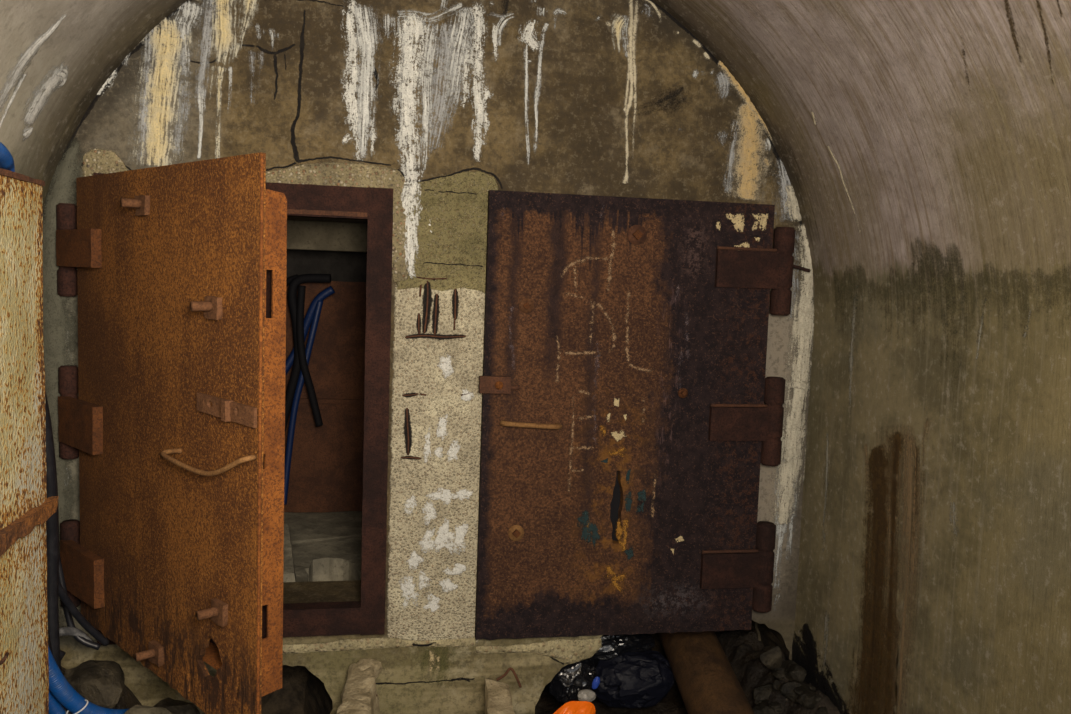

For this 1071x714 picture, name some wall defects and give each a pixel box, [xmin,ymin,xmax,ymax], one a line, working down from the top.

damp [0,15,66,127]
crack [43,0,192,219]
damp [129,0,275,166]
crack [187,0,503,195]
damp [341,0,566,278]
damp [597,0,686,183]
crack [649,0,808,262]
crack [423,260,483,268]
damp [693,40,814,608]
corrosion [616,519,629,551]
corrosion [850,418,929,714]